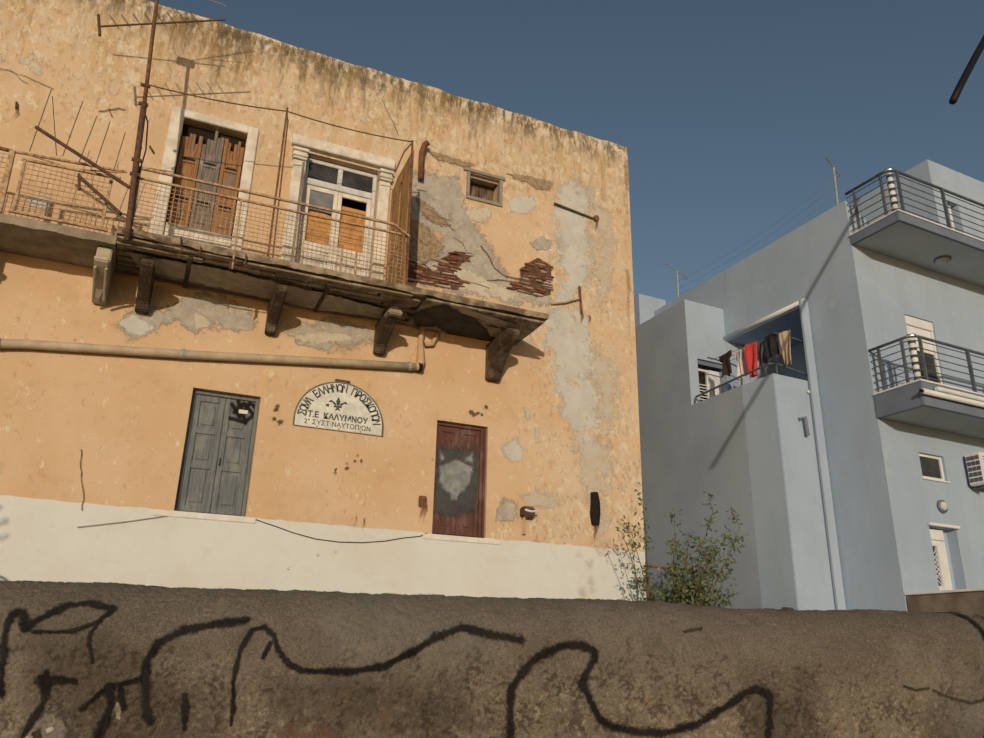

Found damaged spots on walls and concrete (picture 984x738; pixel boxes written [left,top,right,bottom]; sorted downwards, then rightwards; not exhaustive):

peeling [118,252,384,353]
peeling [408,151,621,548]